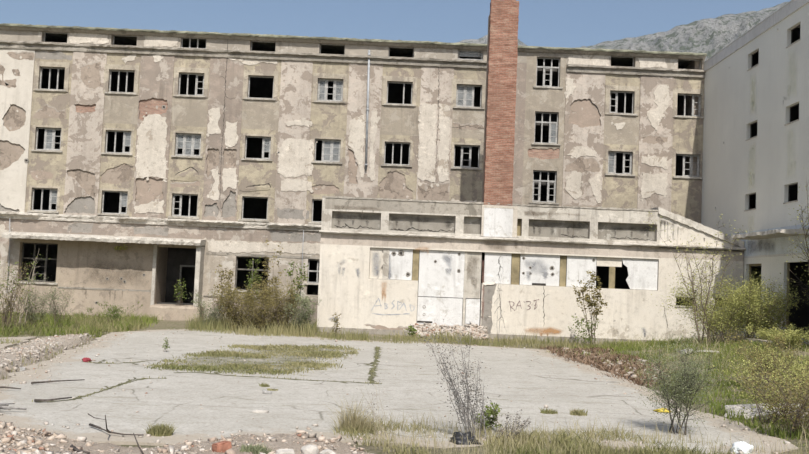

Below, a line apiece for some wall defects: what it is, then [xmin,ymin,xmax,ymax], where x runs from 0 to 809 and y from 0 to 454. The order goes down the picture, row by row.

flaking render [0,104,29,170]